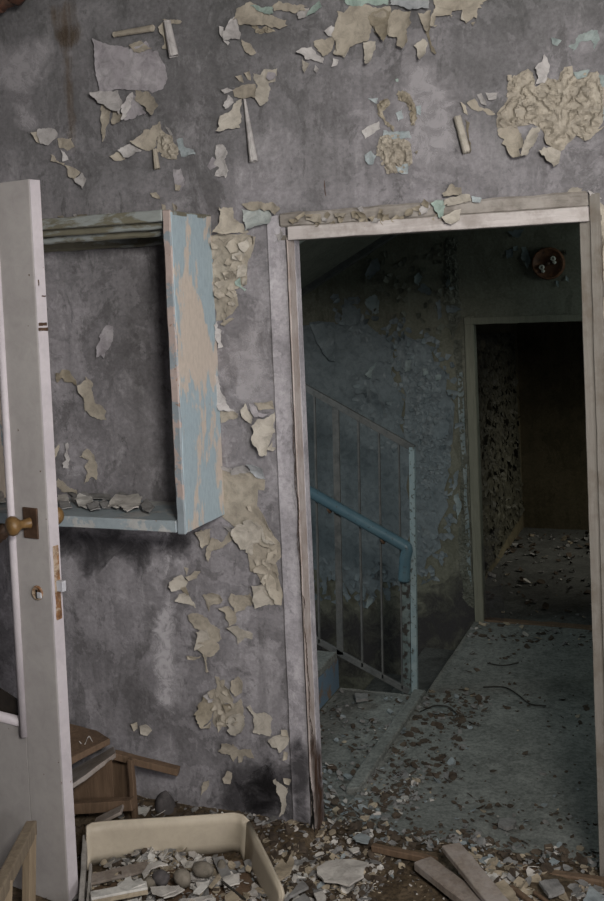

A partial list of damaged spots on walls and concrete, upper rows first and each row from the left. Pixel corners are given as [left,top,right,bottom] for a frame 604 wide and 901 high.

peeling [219,1,322,55]
peeling [296,0,486,73]
peeling [89,19,195,191]
peeling [362,79,421,174]
peeling [210,201,280,348]
peeling [289,183,482,227]
peeling [568,187,604,274]
peeling [96,325,113,358]
peeling [55,369,106,420]
peeling [303,243,474,608]
peeling [476,332,525,575]
peeling [168,374,290,784]